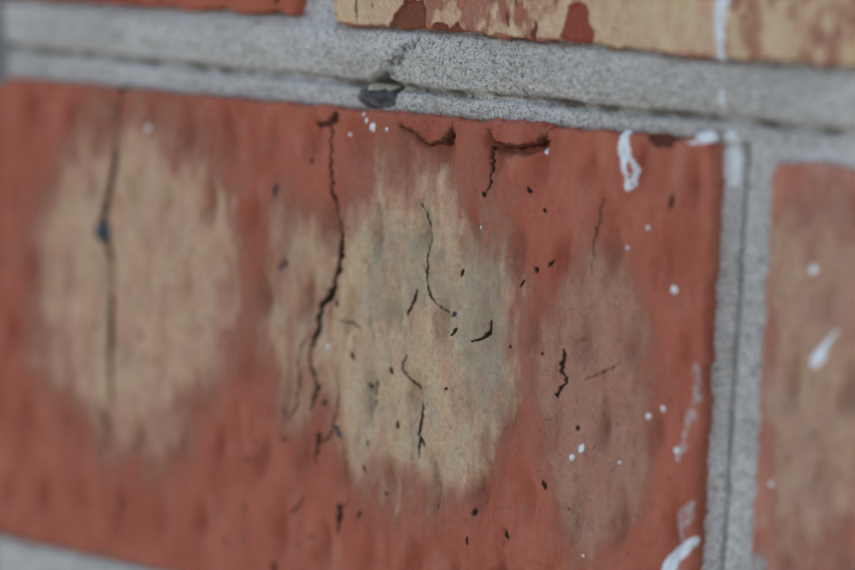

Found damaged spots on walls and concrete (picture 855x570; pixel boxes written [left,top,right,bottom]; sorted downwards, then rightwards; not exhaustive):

water stain [334,0,404,27]
spalling [390,0,469,32]
spalling [560,2,595,44]
water stain [417,0,855,67]
peeling [396,109,459,147]
peeling [486,117,559,150]
crack [486,146,500,194]
crack [98,90,126,429]
crack [407,204,450,316]
crack [284,120,362,464]
crack [471,320,493,342]
crack [402,355,425,458]